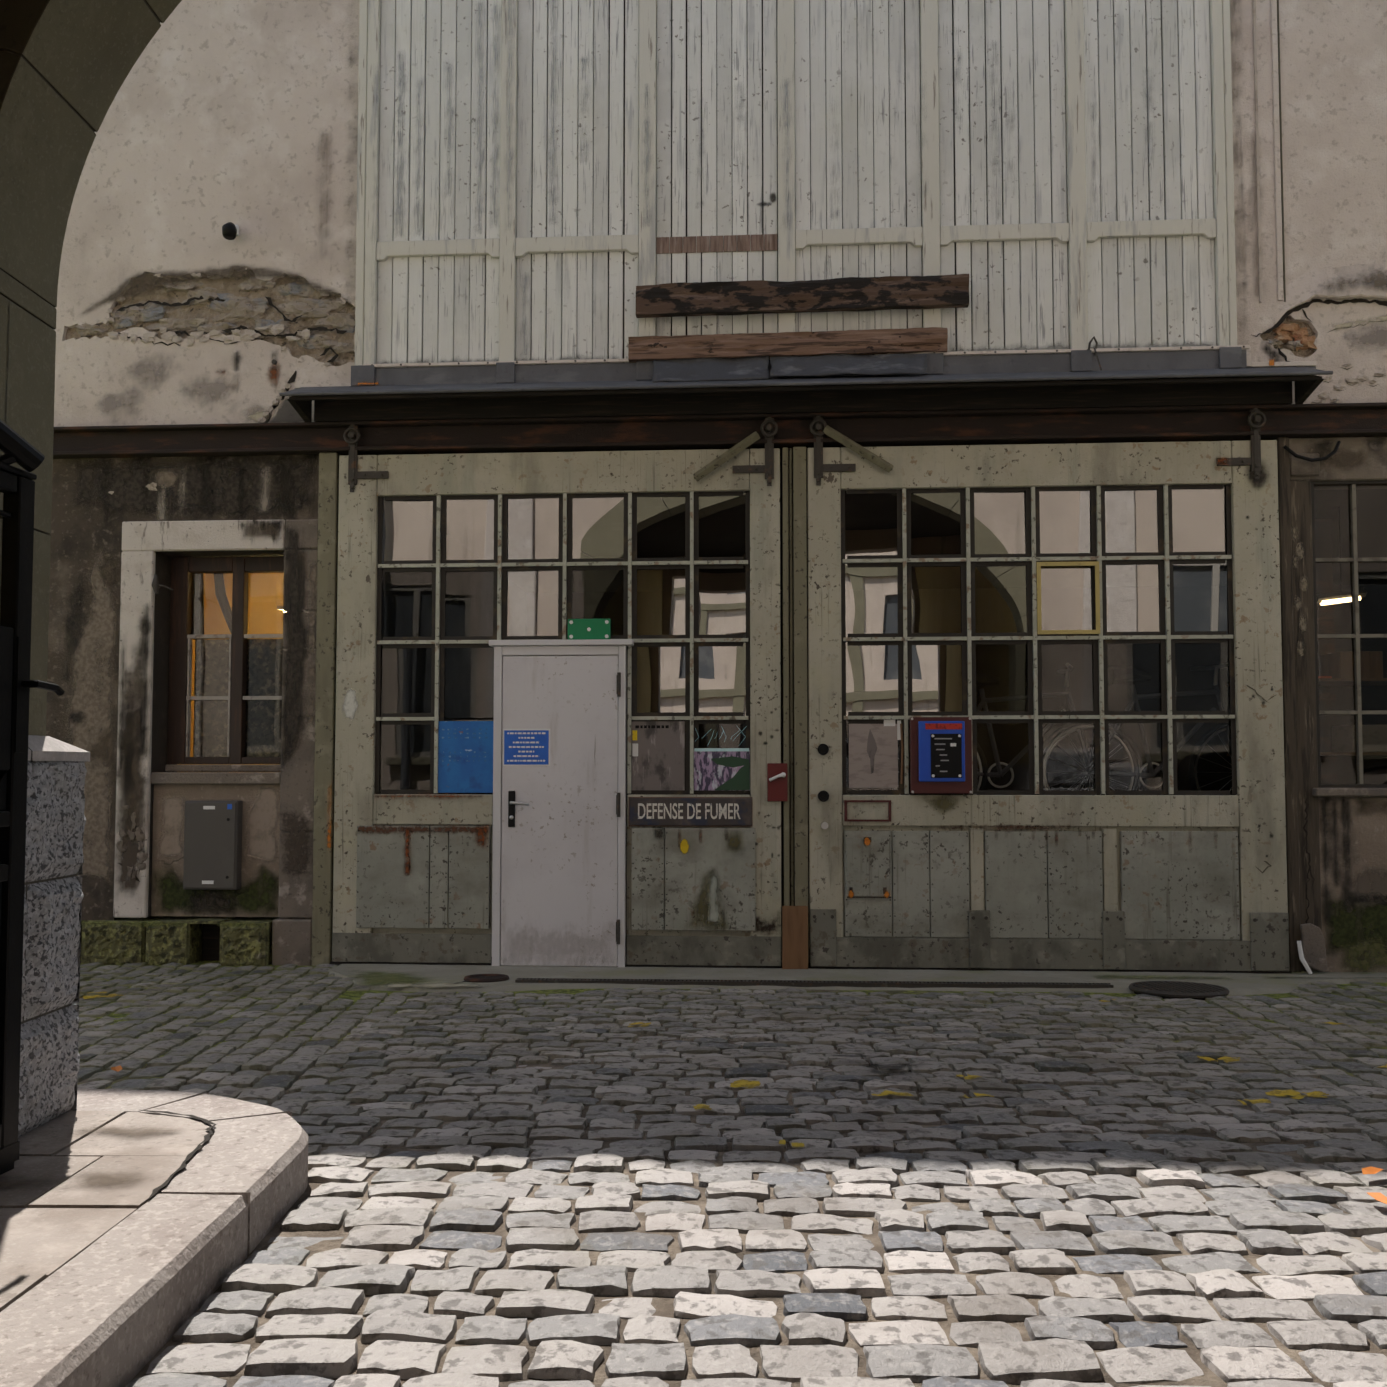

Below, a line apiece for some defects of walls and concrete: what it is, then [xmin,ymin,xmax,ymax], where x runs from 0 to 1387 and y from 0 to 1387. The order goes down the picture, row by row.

spalling [66,266,355,367]
spalling [1260,317,1317,362]
peeling [1312,329,1387,404]
damp [76,454,317,765]
damp [66,552,150,877]
corrosion [358,825,488,846]
crack [142,1110,217,1199]